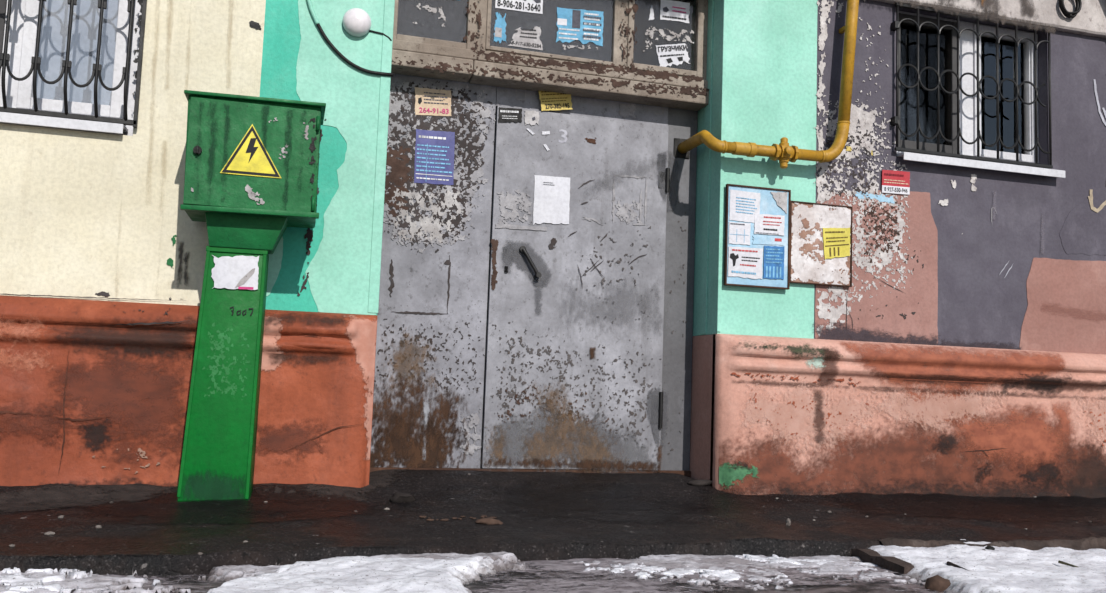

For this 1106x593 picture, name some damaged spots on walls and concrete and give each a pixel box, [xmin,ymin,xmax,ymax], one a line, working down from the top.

peeling [383,0,709,254]
peeling [813,0,924,336]
peeling [491,239,499,290]
crack [0,352,103,469]
water stain [0,319,193,463]
water stain [85,472,383,524]
water stain [256,424,325,455]
corrosion [370,334,469,468]
water stain [719,322,1106,523]